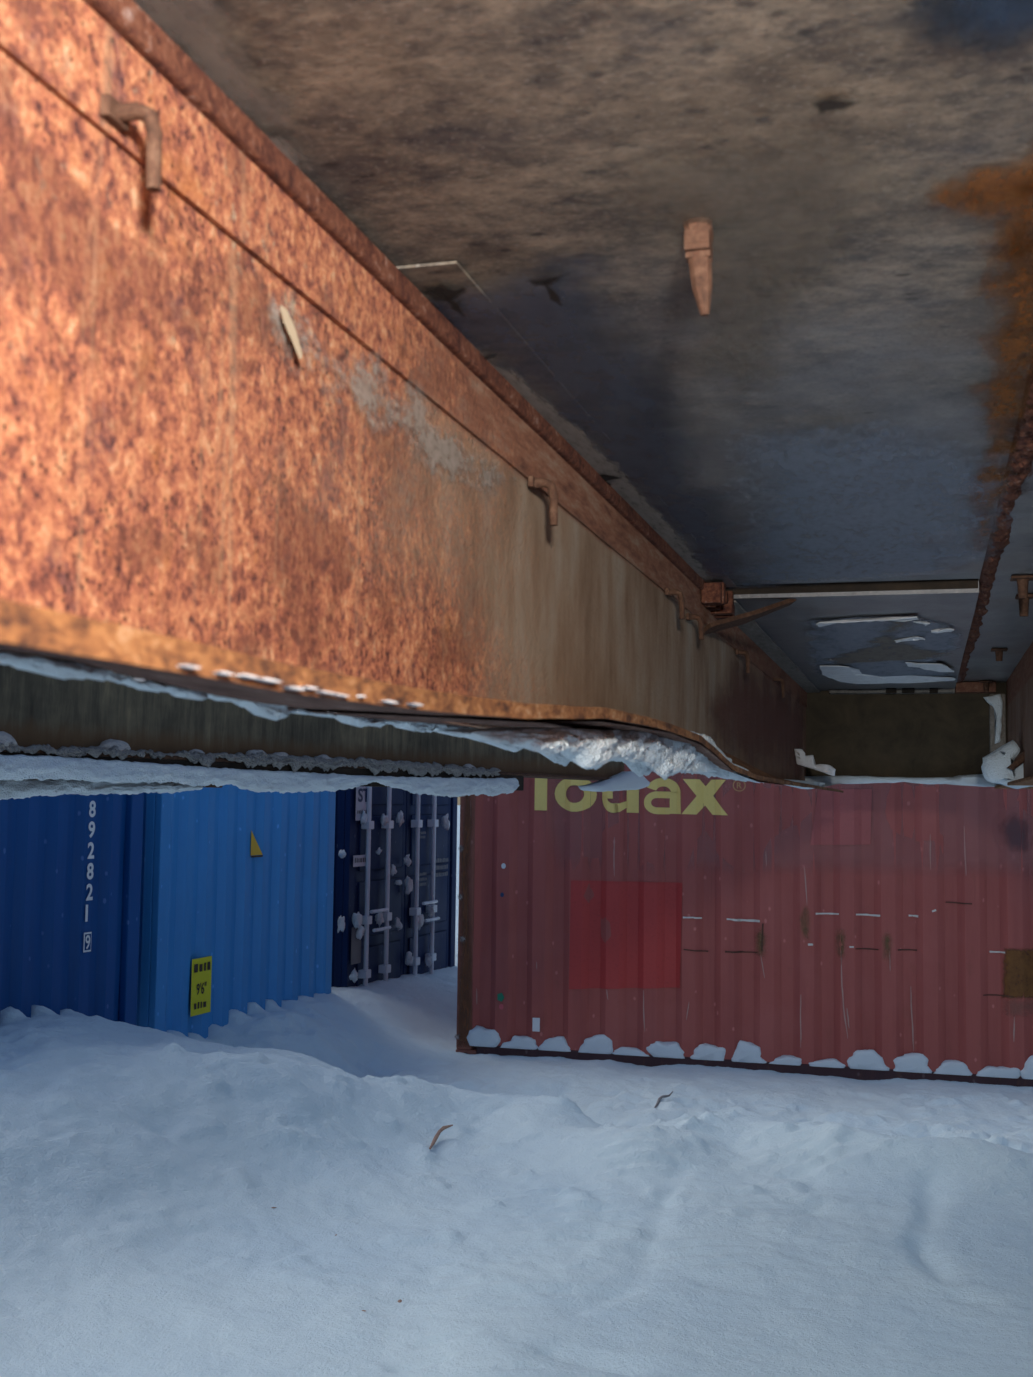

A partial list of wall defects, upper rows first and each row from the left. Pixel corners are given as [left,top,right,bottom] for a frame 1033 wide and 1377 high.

peeling [809,616,957,685]